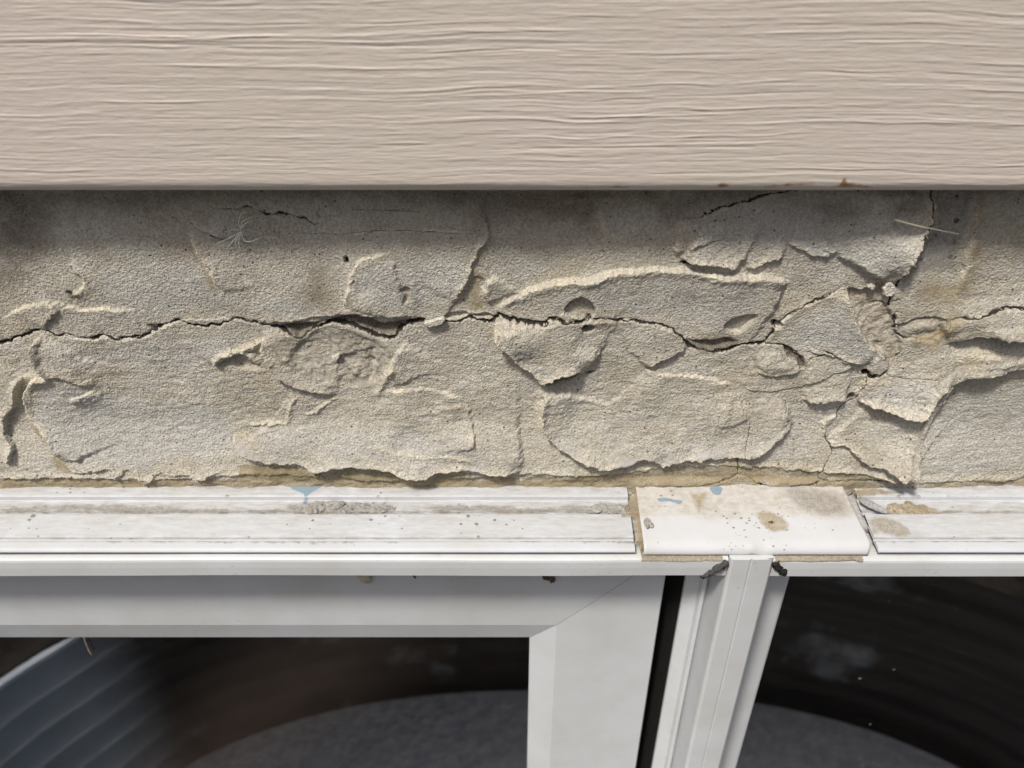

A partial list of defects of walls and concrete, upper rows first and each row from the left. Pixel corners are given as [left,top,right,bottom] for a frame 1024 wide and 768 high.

spalling [274,332,386,386]
flaking render [424,316,445,327]
crack [0,190,1024,488]
spalling [724,314,758,334]
spalling [848,282,948,367]